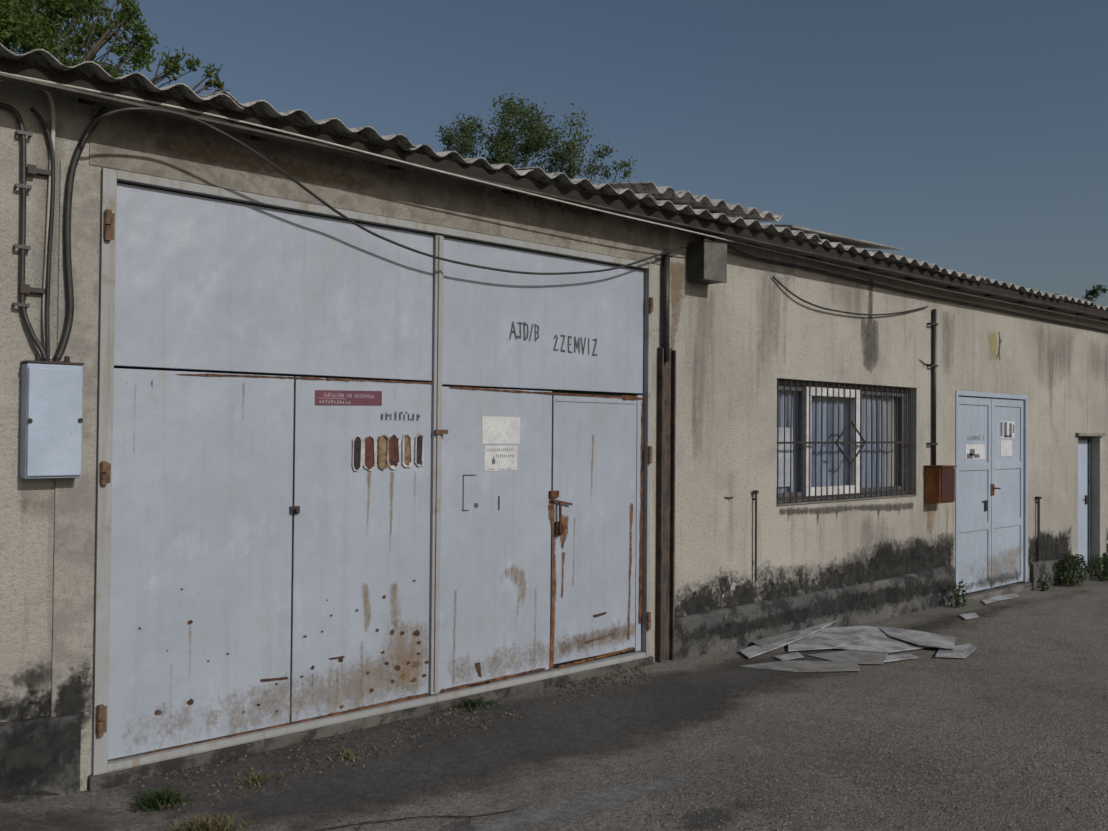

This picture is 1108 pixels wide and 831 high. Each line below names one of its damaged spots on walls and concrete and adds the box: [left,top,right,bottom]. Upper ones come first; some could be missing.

damp [862,279,878,370]
corrosion [356,586,429,683]
corrosion [441,386,644,693]
mould [674,528,1072,643]
damp [0,667,92,798]
corrosion [114,688,428,761]